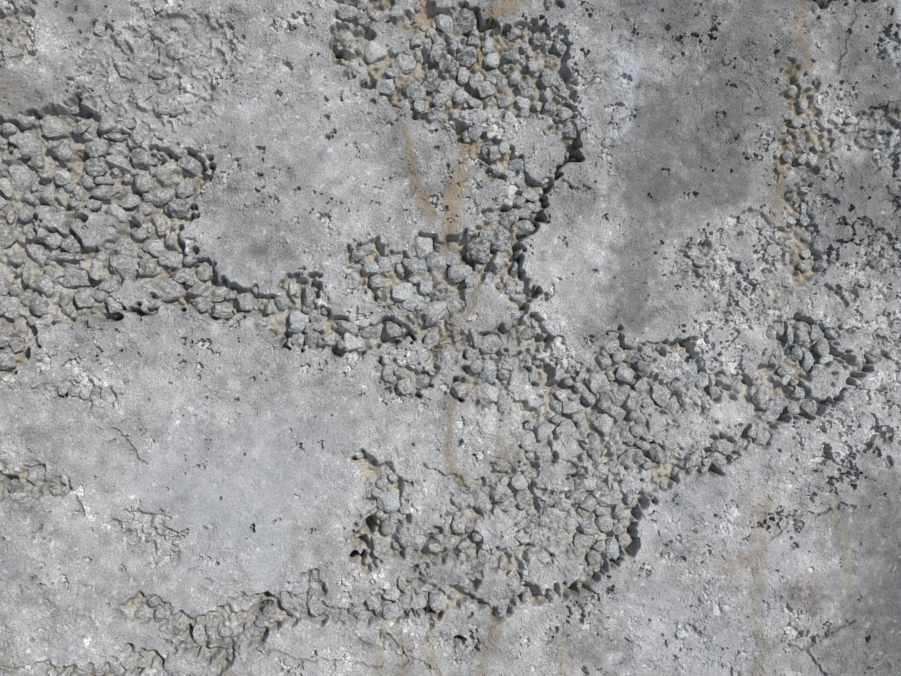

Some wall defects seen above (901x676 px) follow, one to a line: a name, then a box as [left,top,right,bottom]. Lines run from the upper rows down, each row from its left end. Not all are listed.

spalling [0,1,37,69]
peeling [355,0,422,68]
peeling [33,205,123,256]
peeling [109,268,161,322]
peeling [423,359,472,388]
peeling [491,333,555,410]
peeling [650,344,690,386]
peeling [798,329,901,402]
peeling [640,389,755,462]
peeling [528,429,605,502]
peeling [607,461,654,500]
peeling [363,504,587,619]